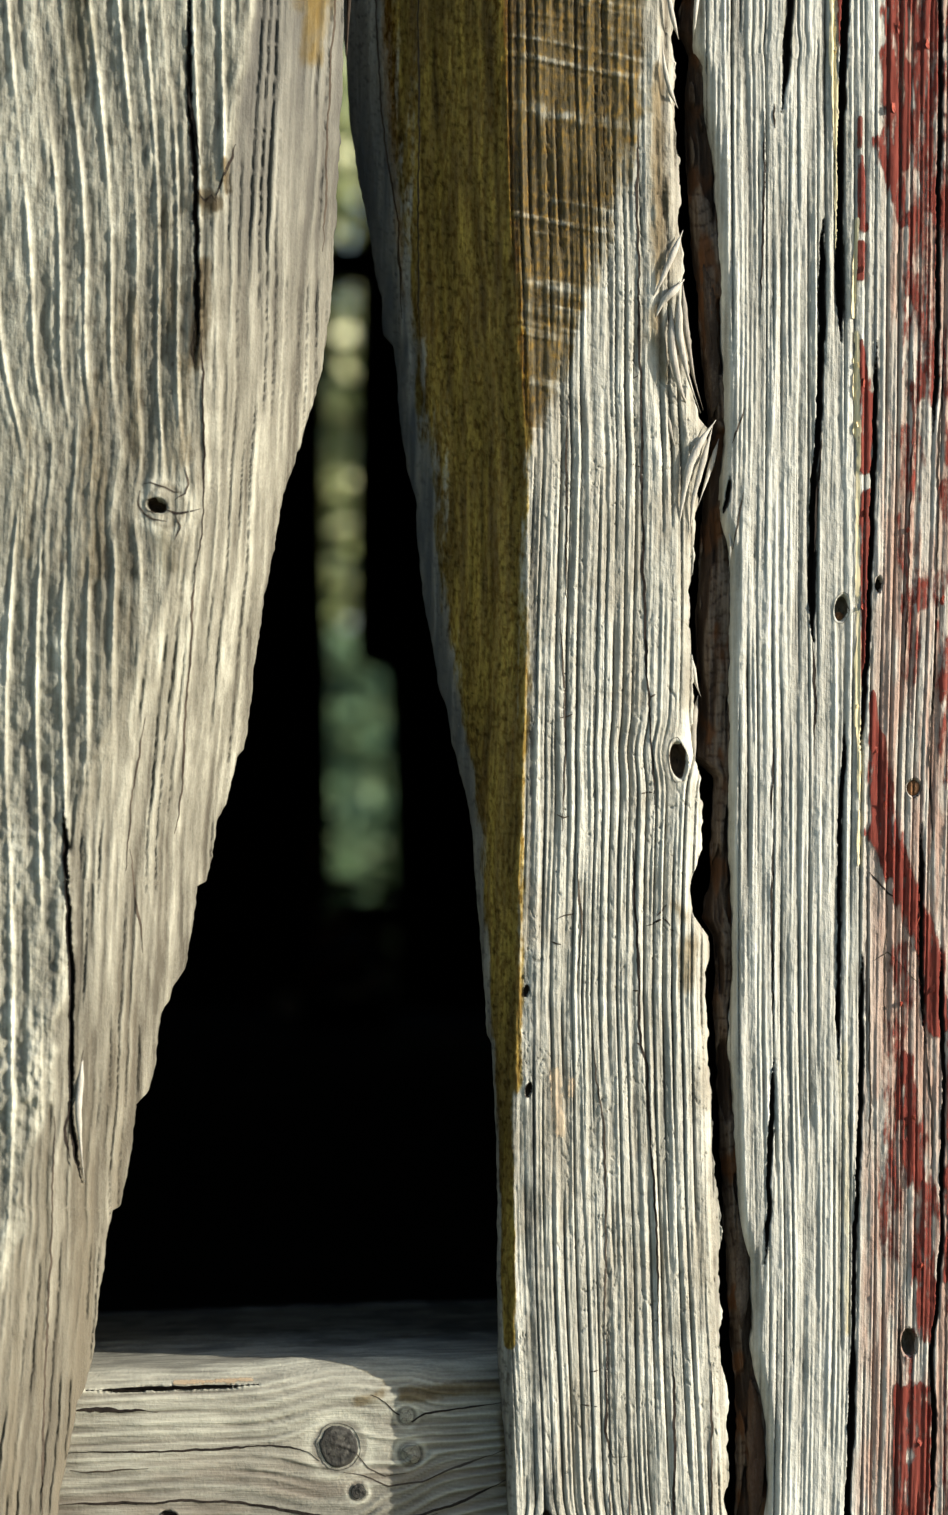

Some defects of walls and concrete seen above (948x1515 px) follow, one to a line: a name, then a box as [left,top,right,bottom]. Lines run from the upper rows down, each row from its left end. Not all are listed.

crack [126,717,146,953]
crack [137,0,236,834]
crack [41,805,505,1515]
crack [581,1029,631,1515]
crack [632,833,714,1515]
crack [723,408,745,549]
crack [764,749,774,1261]
crack [760,0,793,298]
crack [808,0,946,1515]
peeling [829,0,948,1515]